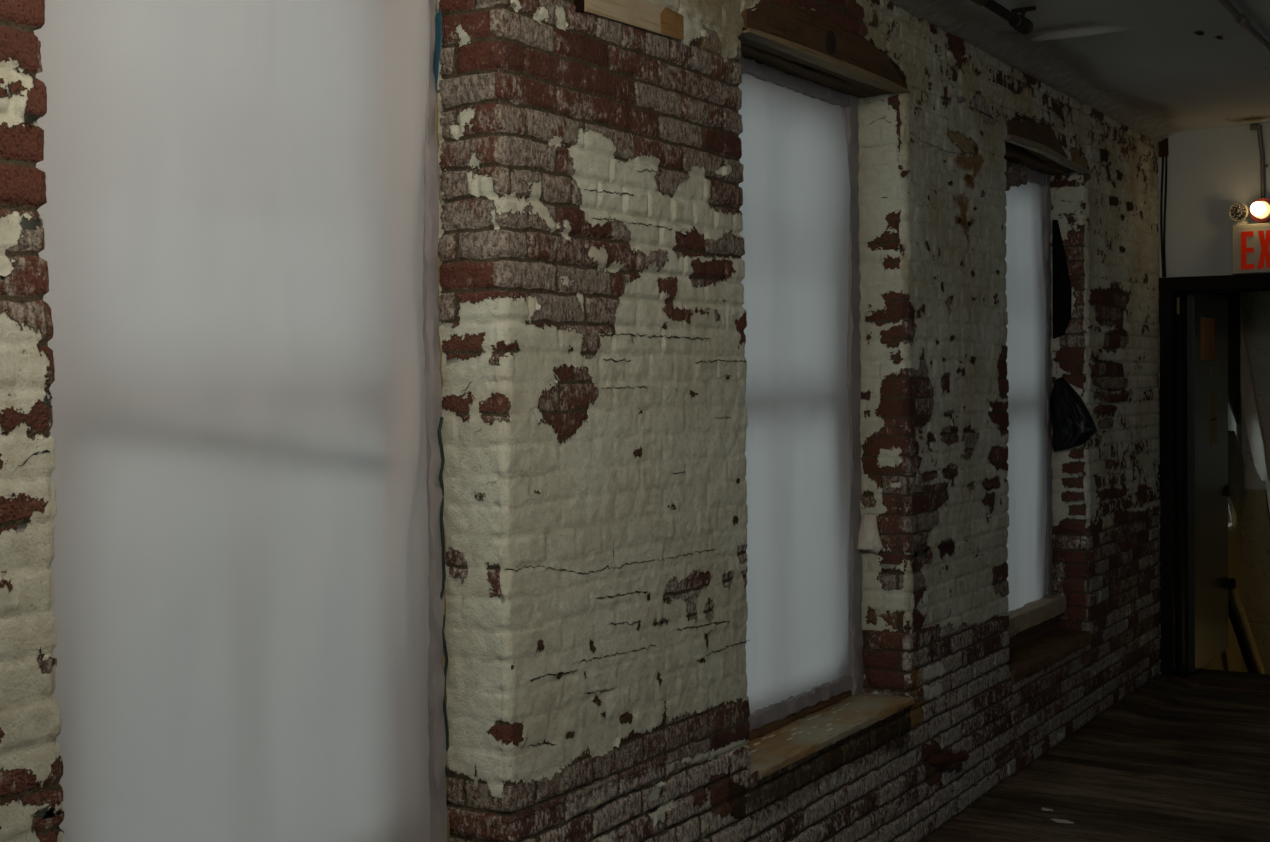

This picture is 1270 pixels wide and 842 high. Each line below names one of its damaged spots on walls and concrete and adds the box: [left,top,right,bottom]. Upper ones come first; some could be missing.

peeling [0,0,55,440]
peeling [437,0,745,444]
peeling [867,210,901,270]
spalling [735,307,747,350]
peeling [1052,229,1131,429]
peeling [0,493,49,535]
peeling [861,290,1009,689]
peeling [1059,446,1149,553]
peeling [37,654,57,673]
crack [505,543,748,694]
peeling [0,755,64,842]
peeling [446,672,750,842]